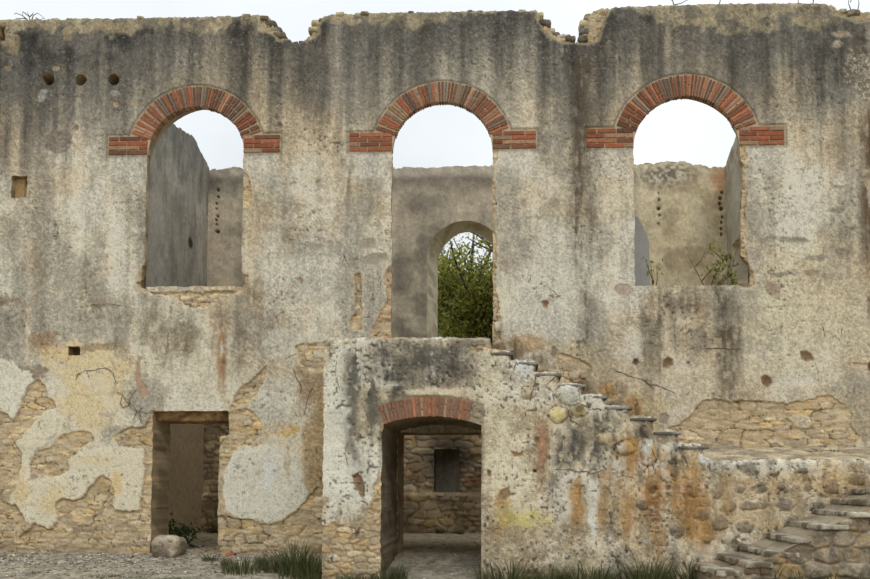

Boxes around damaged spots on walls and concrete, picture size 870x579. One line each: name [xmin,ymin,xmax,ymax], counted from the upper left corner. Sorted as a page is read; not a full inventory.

leakage [573,61,590,190]
leakage [862,184,870,235]
spalling [0,378,157,553]
spalling [218,363,269,478]
spalling [292,340,324,375]
rust [571,478,583,522]
rust [619,437,709,551]
spalling [658,373,862,449]